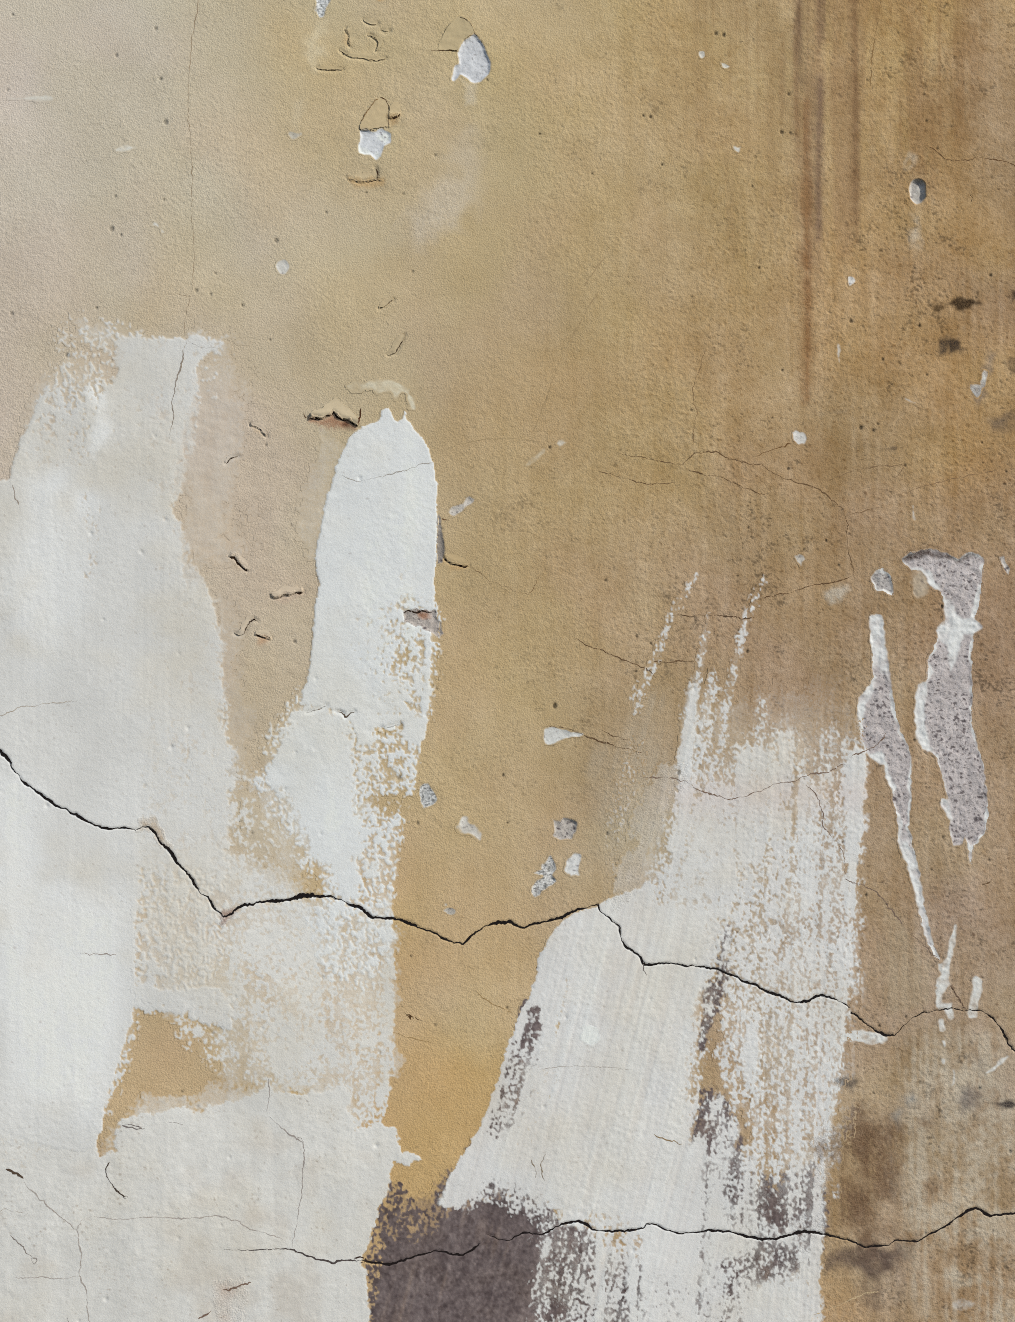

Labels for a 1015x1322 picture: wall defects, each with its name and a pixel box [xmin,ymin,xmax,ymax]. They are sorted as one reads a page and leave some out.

flaking render [312,0,331,19]
peeling [317,27,386,70]
peeling [431,16,492,84]
flaking render [345,97,403,191]
water stain [646,0,1015,409]
peeling [304,396,361,435]
flaking render [869,566,932,601]
crack [572,636,692,677]
crack [0,700,77,716]
crack [0,726,1015,1051]
flaking render [530,816,583,899]
crack [1,1079,1015,1322]